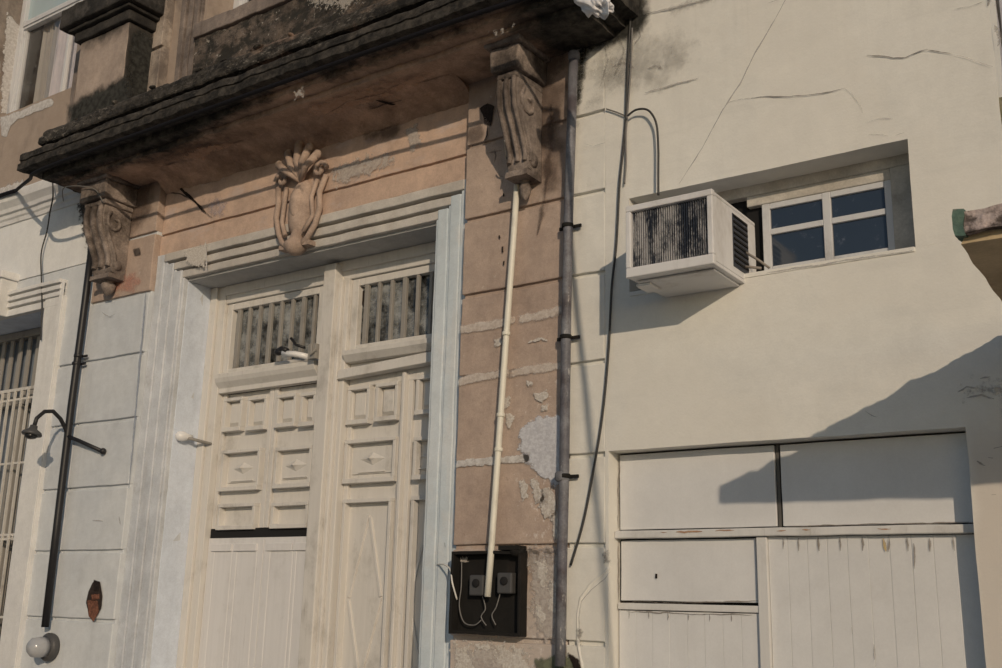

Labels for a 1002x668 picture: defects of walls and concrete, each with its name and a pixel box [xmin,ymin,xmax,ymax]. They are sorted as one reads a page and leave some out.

crack [651,0,705,13]
leakage [577,47,589,105]
crack [712,1,857,129]
crack [867,49,993,67]
crack [172,188,207,214]
peeling [519,306,562,323]
peeling [504,362,561,643]
peeling [449,635,581,668]